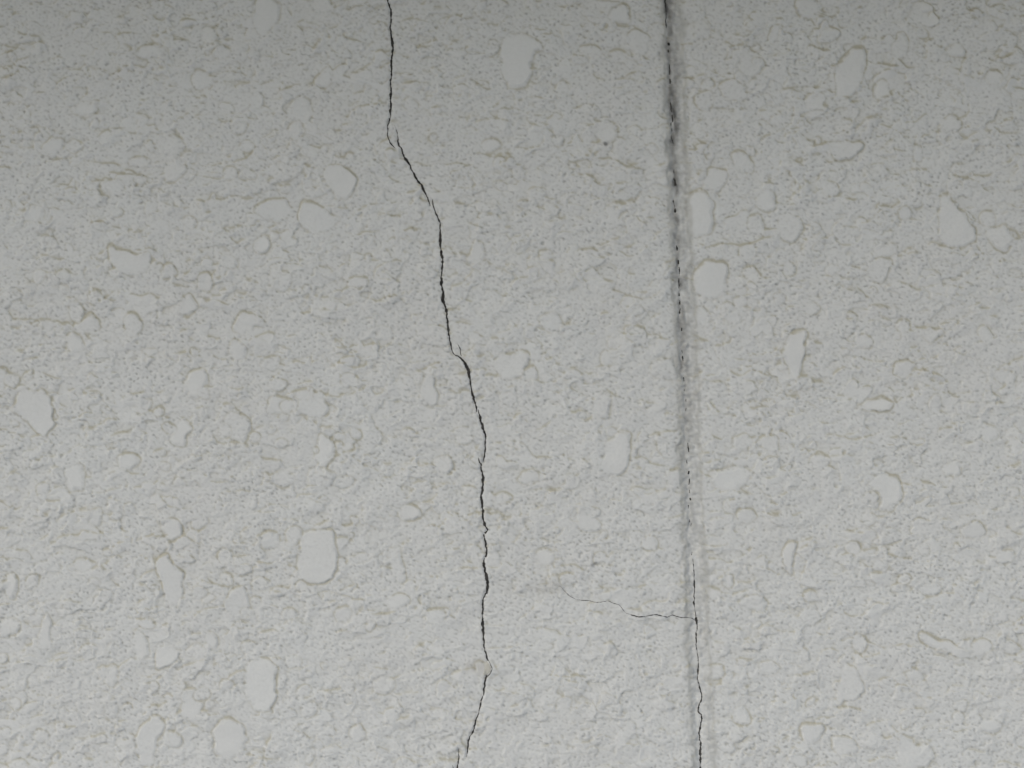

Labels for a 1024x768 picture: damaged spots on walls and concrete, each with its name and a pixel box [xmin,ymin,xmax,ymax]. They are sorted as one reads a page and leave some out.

crack [664,0,673,143]
crack [387,0,492,768]
crack [561,554,703,768]